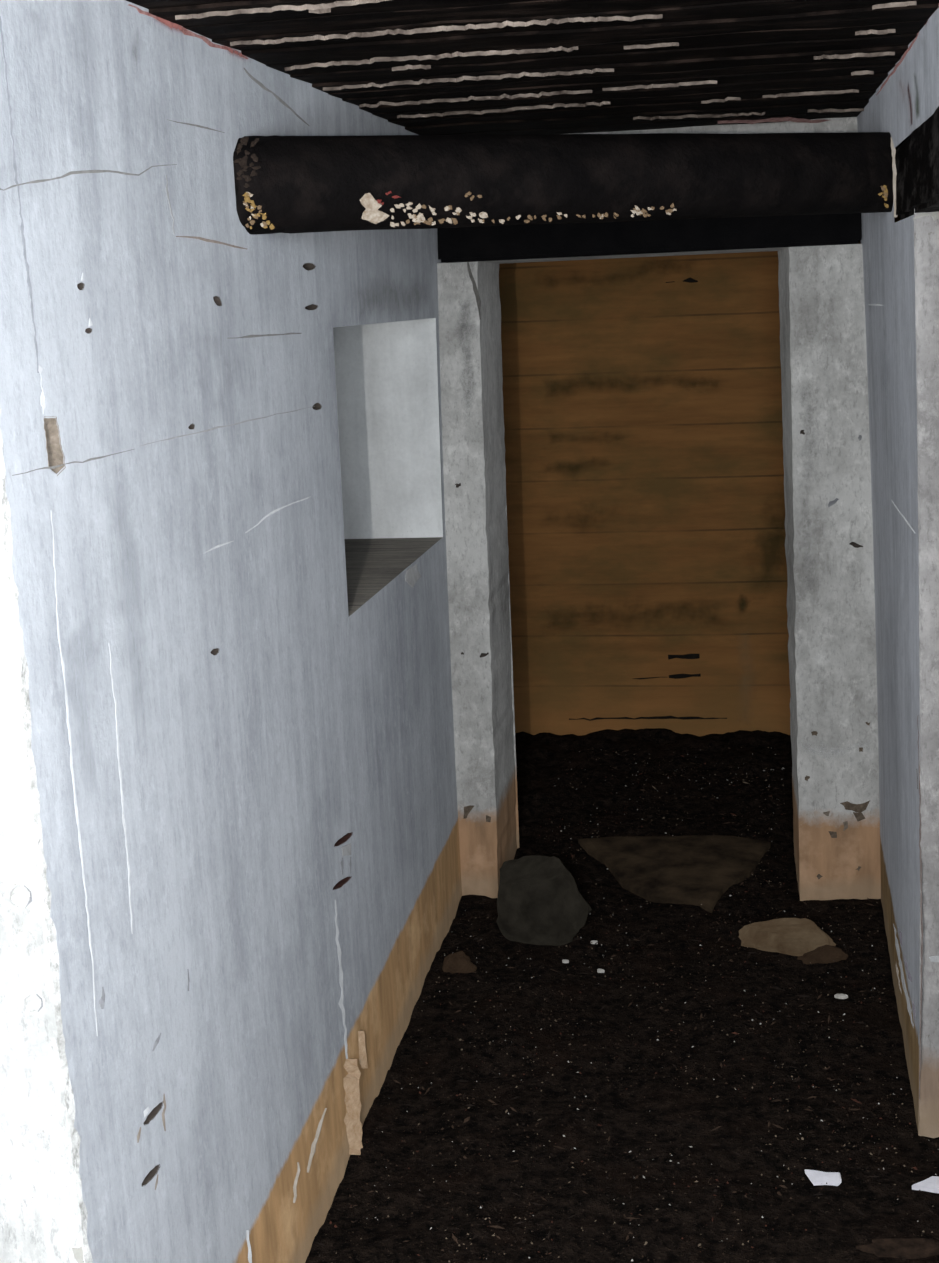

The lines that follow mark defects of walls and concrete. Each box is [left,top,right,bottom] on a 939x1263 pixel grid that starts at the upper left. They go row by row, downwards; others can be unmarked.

crack [0,16,247,373]
peeling [360,191,677,227]
crack [227,332,302,340]
crack [0,406,315,491]